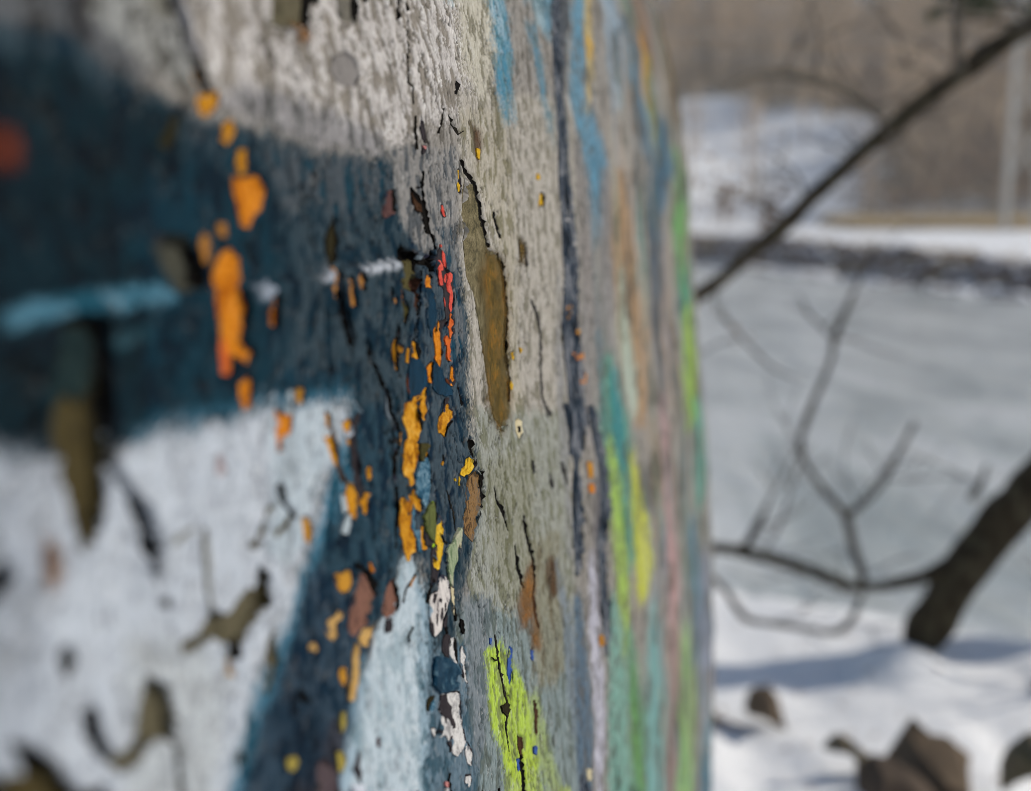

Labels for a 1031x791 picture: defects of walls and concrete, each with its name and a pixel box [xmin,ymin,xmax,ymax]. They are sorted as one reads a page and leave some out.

peeling [191,70,221,116]
spalling [330,51,362,87]
spalling [336,0,360,28]
spalling [381,189,397,219]
crack [396,0,613,656]
spalling [49,315,115,554]
peeling [302,516,314,543]
peeling [323,411,373,534]
spalling [391,169,524,787]
spalling [308,561,400,733]
crack [482,634,539,791]